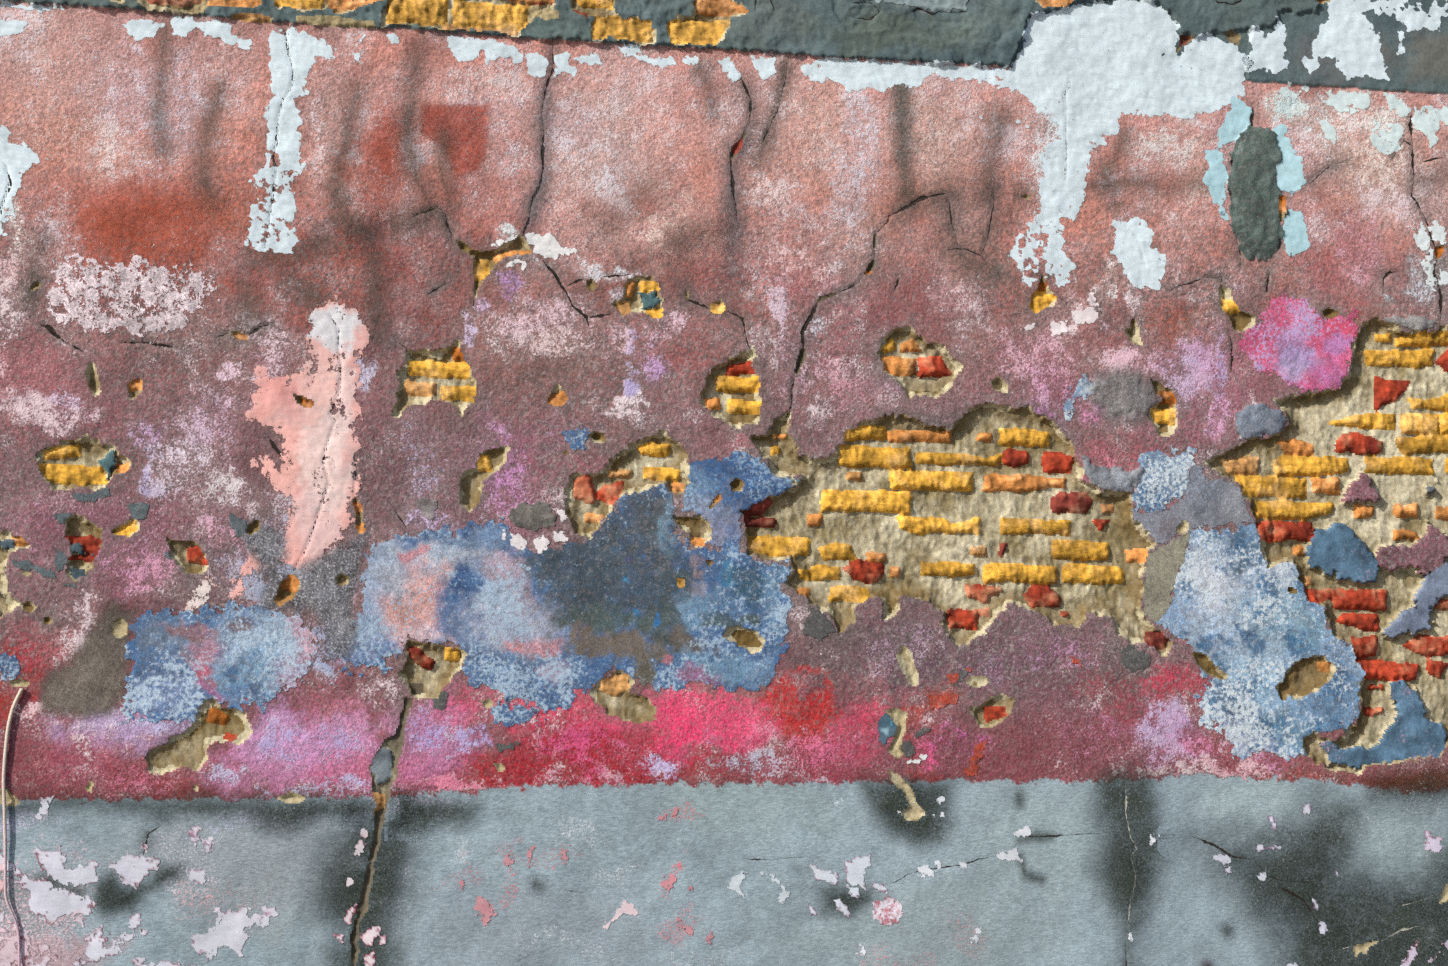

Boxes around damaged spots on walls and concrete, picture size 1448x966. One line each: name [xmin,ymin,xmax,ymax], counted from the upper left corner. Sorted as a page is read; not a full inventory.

peeling [0,125,48,236]
peeling [110,0,777,254]
crack [522,41,629,326]
crack [687,299,751,351]
crack [729,63,787,215]
crack [786,192,999,418]
peeling [800,0,1448,337]
crack [1392,115,1443,319]
spalling [0,433,149,624]
peeling [111,282,1448,792]
peeling [0,788,279,966]
crack [350,696,412,966]